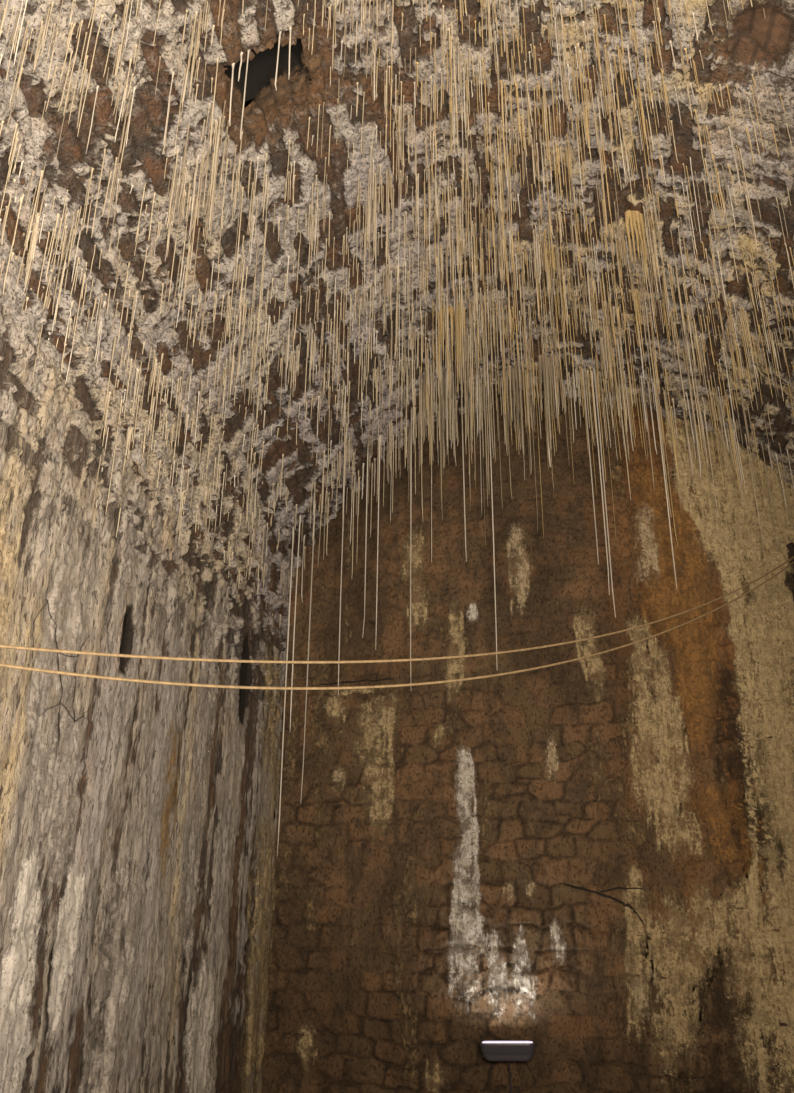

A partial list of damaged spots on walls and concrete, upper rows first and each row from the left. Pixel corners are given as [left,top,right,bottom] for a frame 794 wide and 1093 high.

spalling [223,44,322,121]
water stain [546,740,559,780]
water stain [622,417,794,1093]
water stain [449,746,535,1015]
water stain [550,923,566,958]